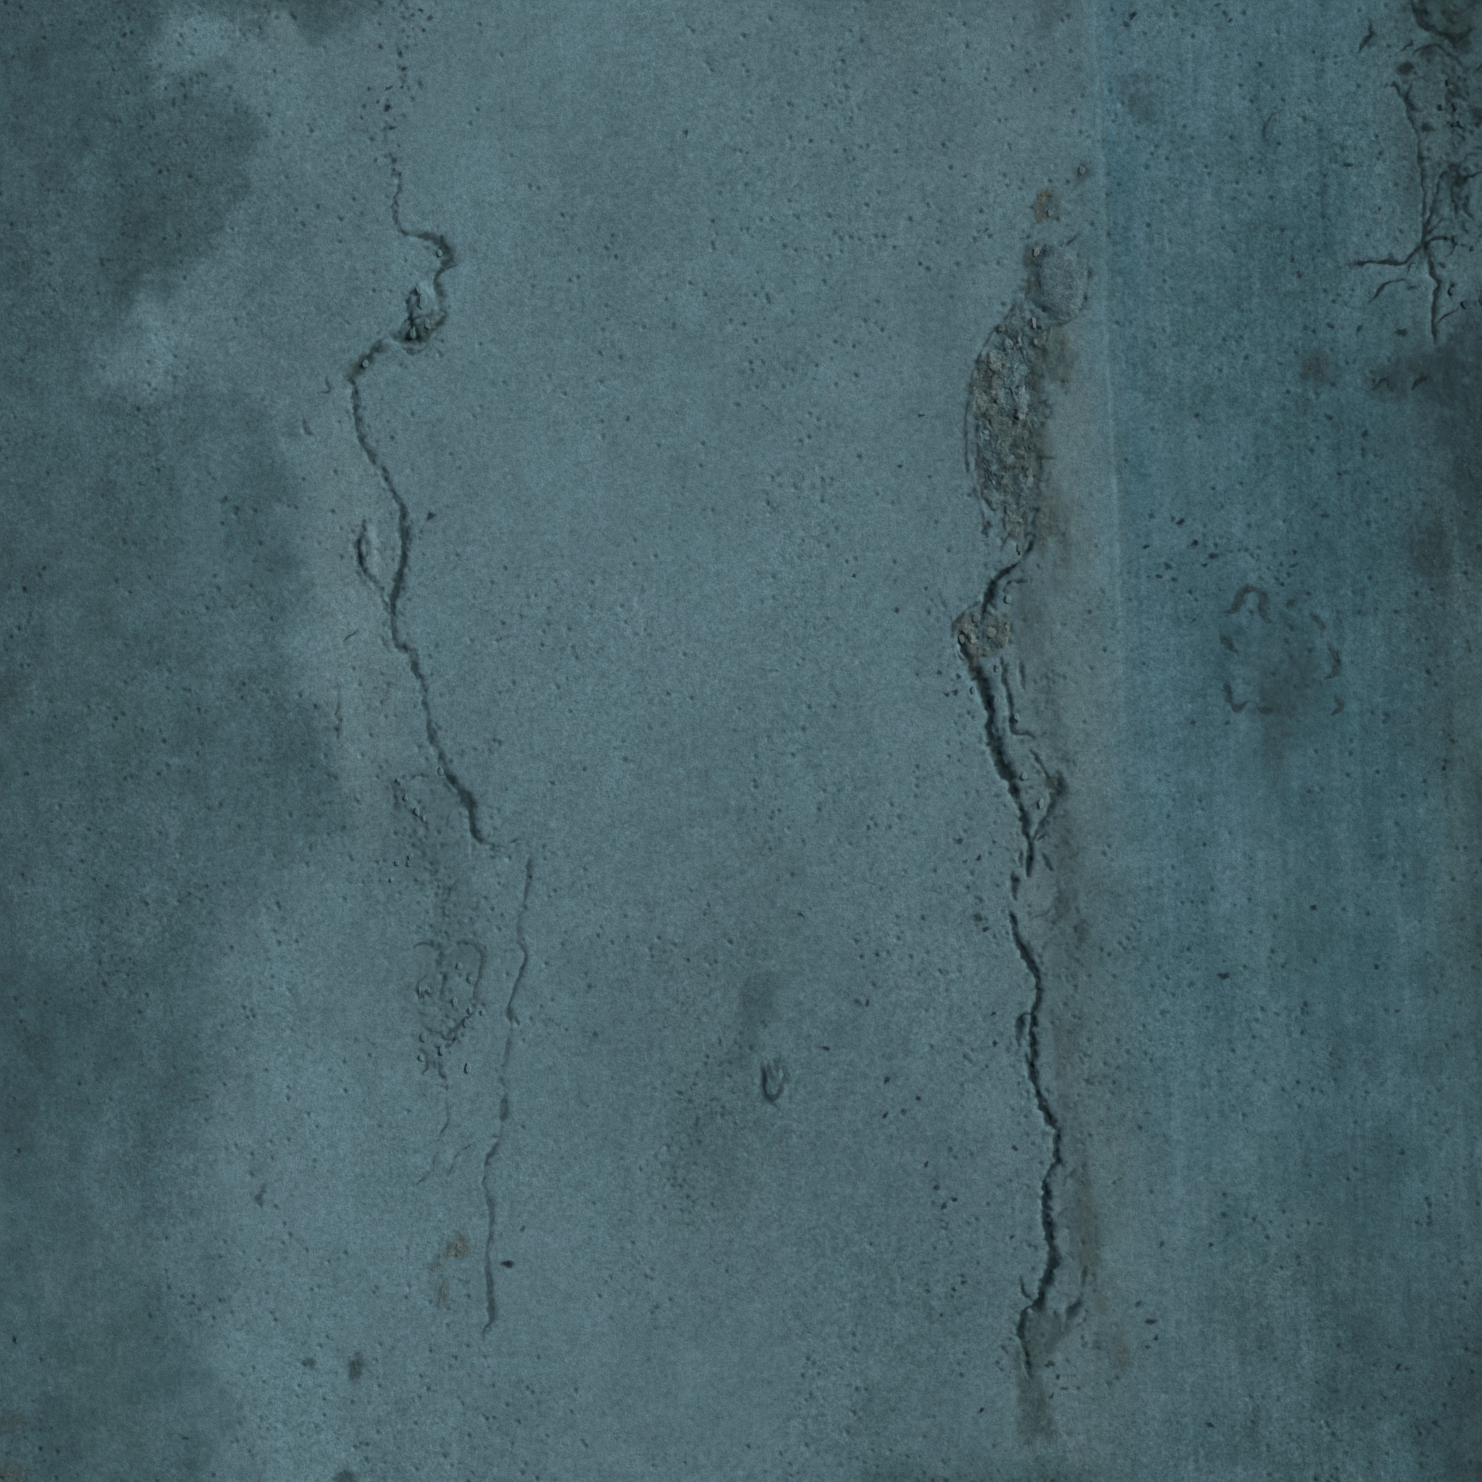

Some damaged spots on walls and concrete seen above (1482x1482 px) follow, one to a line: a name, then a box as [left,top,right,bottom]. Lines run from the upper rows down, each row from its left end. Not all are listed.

crack [324,173,531,1055]
crack [483,1094,506,1334]
spalling [965,303,1052,555]
crack [959,544,1085,1374]